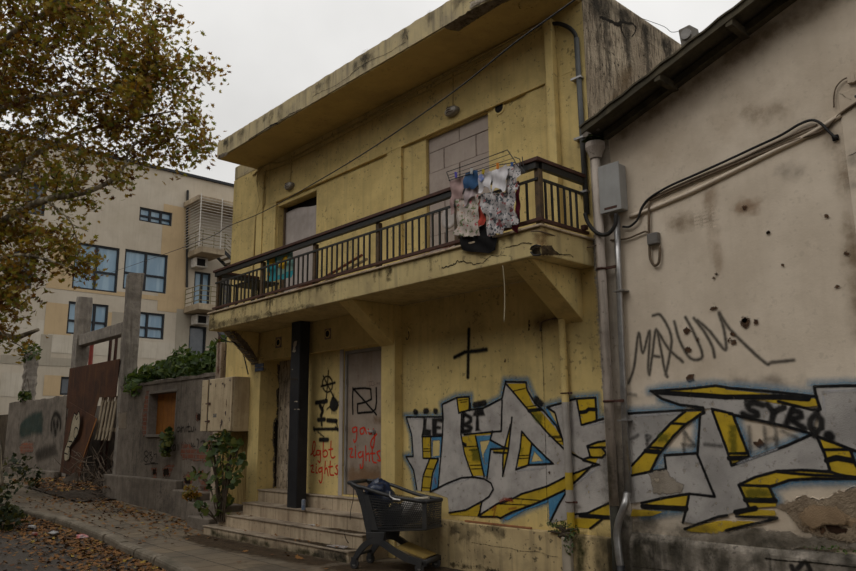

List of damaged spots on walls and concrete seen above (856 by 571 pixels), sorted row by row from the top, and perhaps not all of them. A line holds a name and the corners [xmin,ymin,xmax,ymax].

spalling [445,0,509,31]
water stain [591,0,631,87]
crack [442,242,532,269]
flaking render [690,485,856,550]